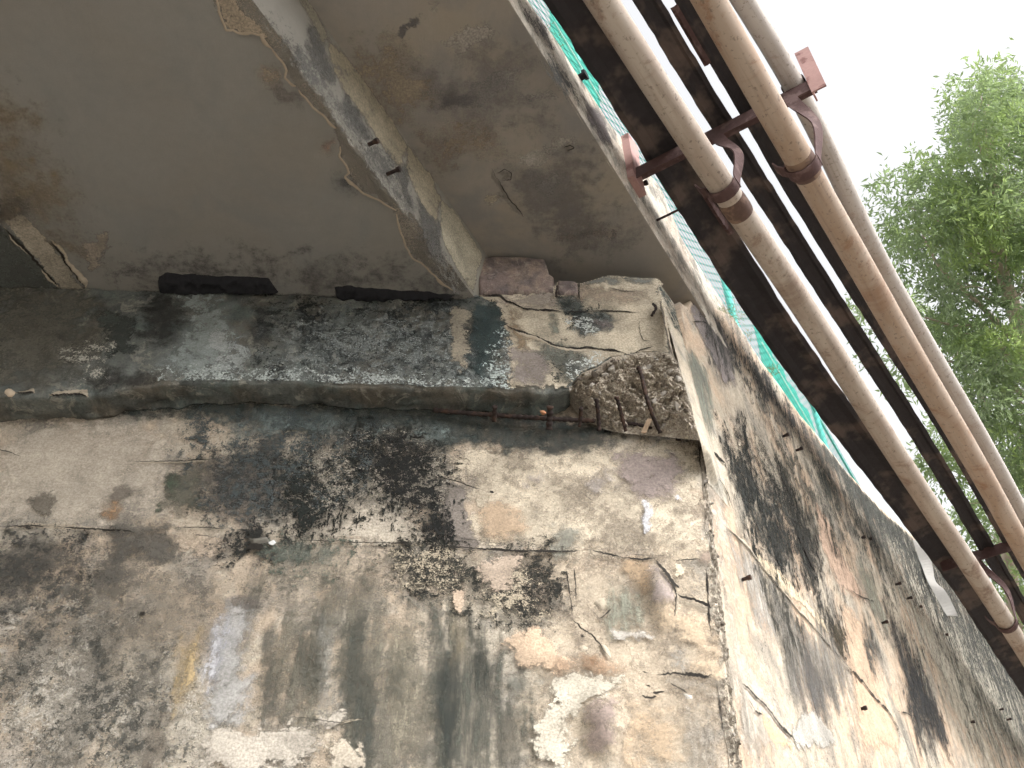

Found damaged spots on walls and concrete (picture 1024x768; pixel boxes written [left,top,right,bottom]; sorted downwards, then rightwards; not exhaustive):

peeling [214,0,465,291]
damp [137,0,674,389]
crack [491,169,523,216]
crack [479,283,681,370]
crack [3,522,132,533]
crack [176,525,226,536]
crack [303,538,711,660]
damp [0,316,1024,768]
spalling [433,301,743,768]
crack [698,443,945,746]